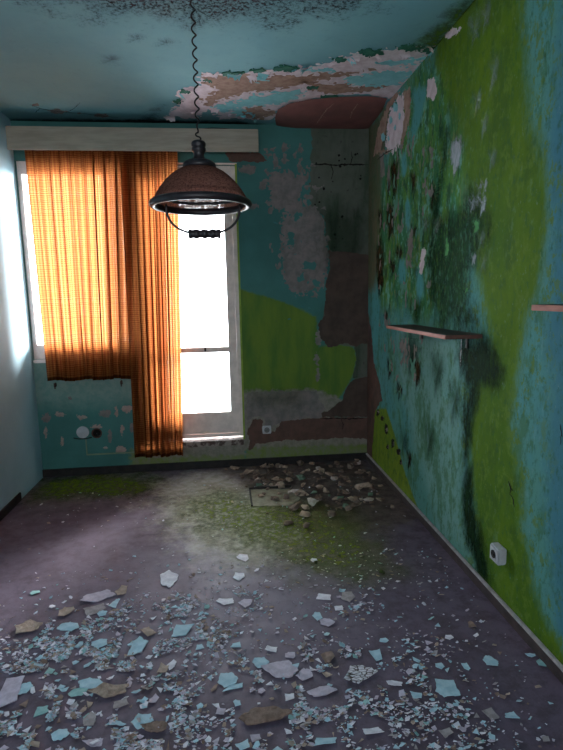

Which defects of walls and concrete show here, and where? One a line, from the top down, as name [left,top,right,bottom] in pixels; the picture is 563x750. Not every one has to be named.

damp [72,0,361,30]
peeling [427,77,437,101]
crack [315,149,393,179]
peeling [164,43,435,465]
damp [424,129,505,582]
peeling [90,405,133,452]